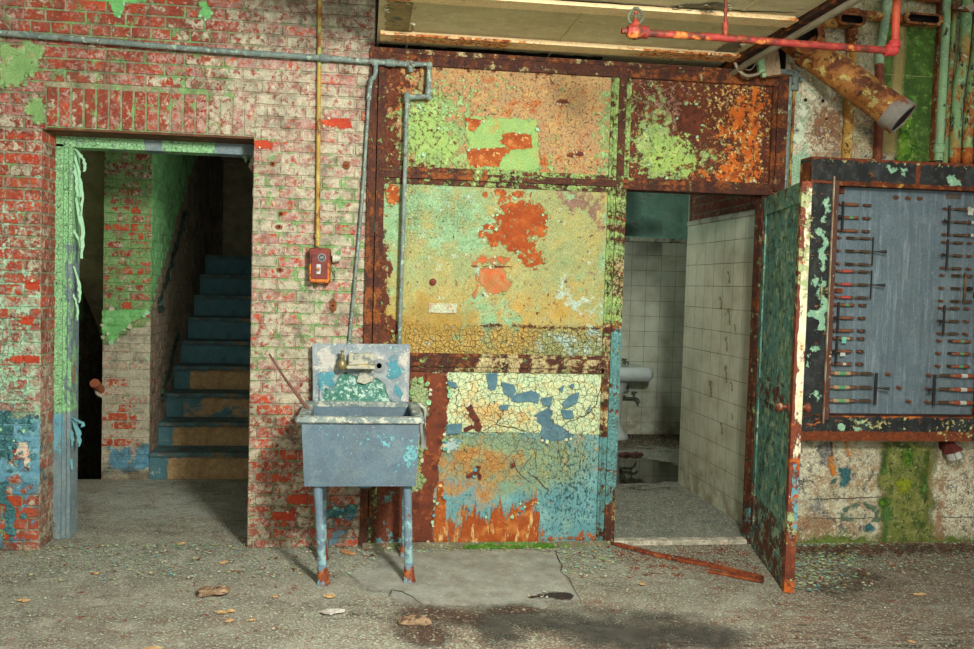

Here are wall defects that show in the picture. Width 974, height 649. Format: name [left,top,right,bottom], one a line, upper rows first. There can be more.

peeling [98,0,146,18]
peeling [401,92,542,174]
corrosion [676,102,706,139]
corrosion [719,87,766,182]
corrosion [478,189,553,271]
crack [404,324,622,494]
peeling [486,373,579,444]
peeling [0,410,40,536]
corrosion [828,442,836,476]
peeling [838,464,851,488]
peeling [794,523,974,591]
leakage [395,606,737,649]